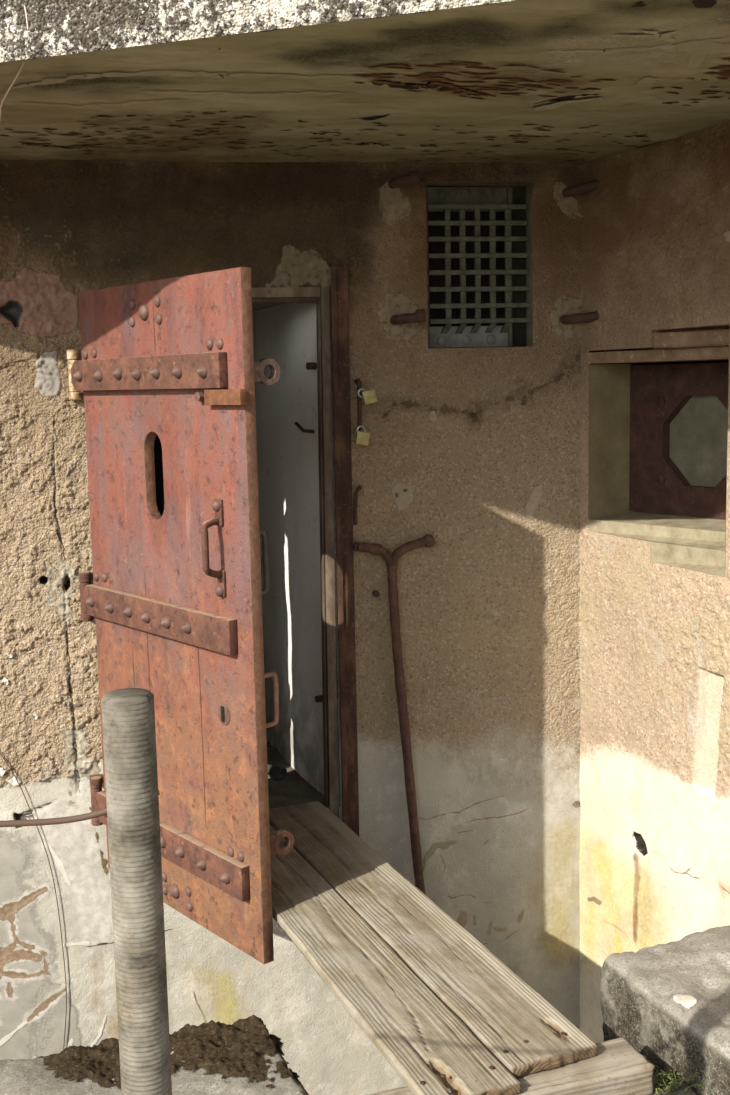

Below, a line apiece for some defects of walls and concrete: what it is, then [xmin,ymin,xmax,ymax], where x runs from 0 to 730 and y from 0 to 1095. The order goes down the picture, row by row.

rust [352,61,617,100]
rust [652,58,730,106]
rust [0,111,387,159]
spalling [265,245,331,288]
crack [14,416,100,828]
crack [419,795,528,845]
peeling [0,831,81,1060]